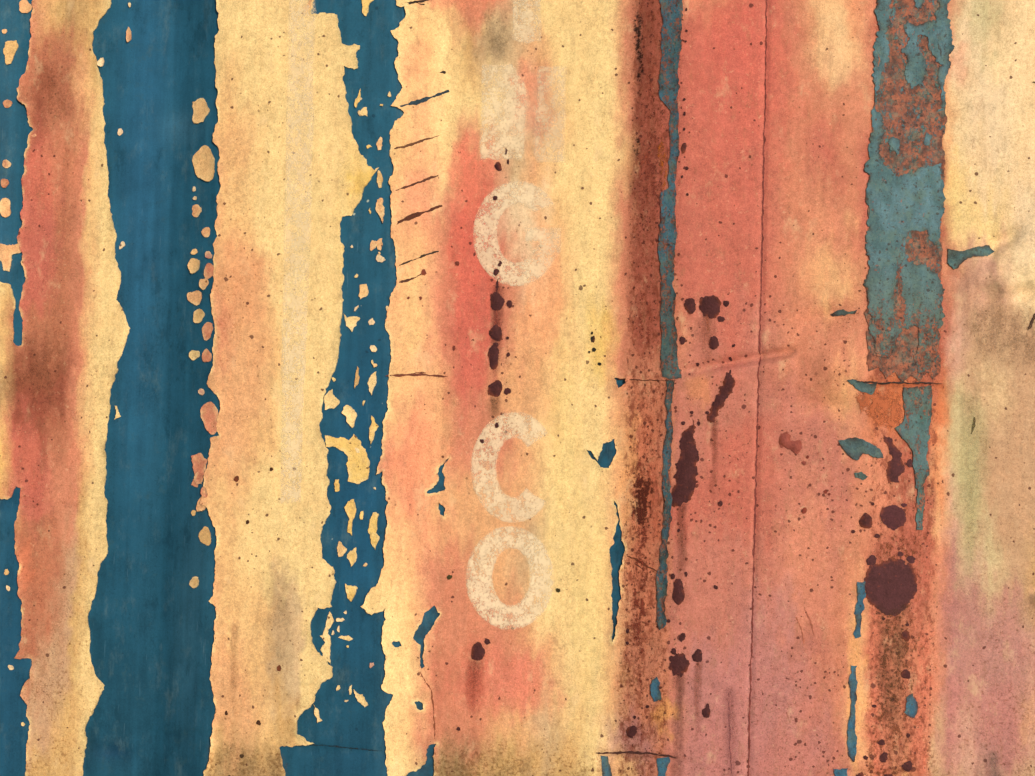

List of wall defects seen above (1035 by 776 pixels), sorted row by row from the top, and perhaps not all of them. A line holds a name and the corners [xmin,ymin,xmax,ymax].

corrosion [634,15,656,83]
peeling [0,0,130,776]
peeling [187,0,383,776]
corrosion [488,261,512,428]
peeling [359,0,1035,776]
corrosion [671,344,736,551]
corrosion [684,295,729,350]
corrosion [855,390,913,483]
corrosion [471,638,491,689]
corrosion [626,404,654,708]
corrosion [671,572,688,605]
corrosion [851,502,921,776]